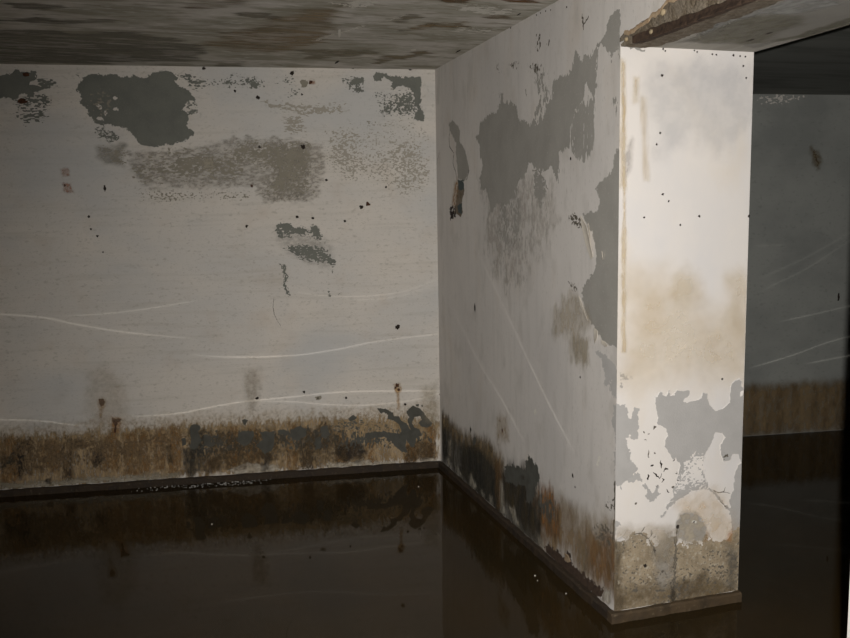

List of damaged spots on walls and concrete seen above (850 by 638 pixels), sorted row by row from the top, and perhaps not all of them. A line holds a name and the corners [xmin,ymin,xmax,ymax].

peeling [0,69,58,127]
peeling [76,67,438,202]
peeling [449,121,469,220]
peeling [476,0,850,258]
peeling [279,264,291,296]
peeling [275,216,336,273]
leakage [0,418,401,488]
rust [0,383,440,490]
leakage [406,414,543,546]
spalling [612,378,744,611]